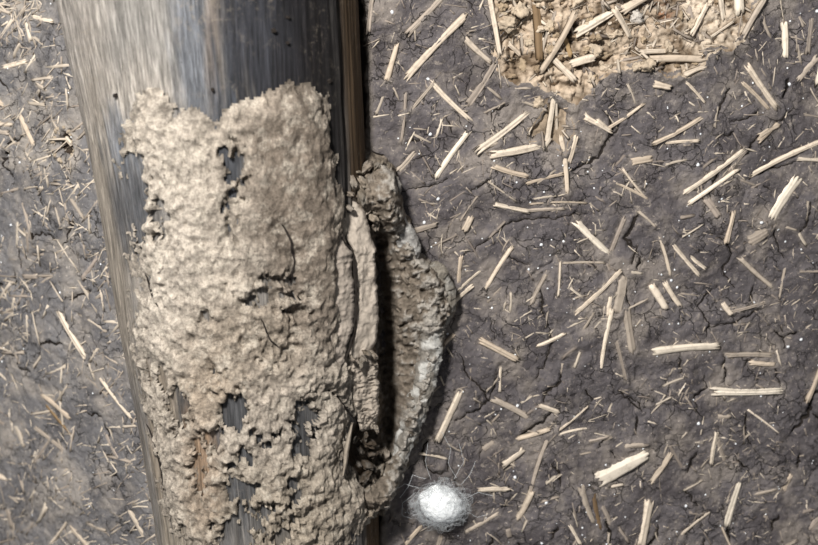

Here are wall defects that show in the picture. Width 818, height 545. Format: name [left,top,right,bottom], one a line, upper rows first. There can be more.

spalling [491,0,760,155]
crack [572,111,619,171]
crack [717,88,757,138]
crack [745,161,795,192]
crack [463,213,588,256]
crack [623,214,641,306]
crack [697,237,762,337]
crack [456,353,497,421]
crack [522,291,562,434]
crack [613,390,642,435]
crack [694,354,750,417]
crack [792,391,818,432]